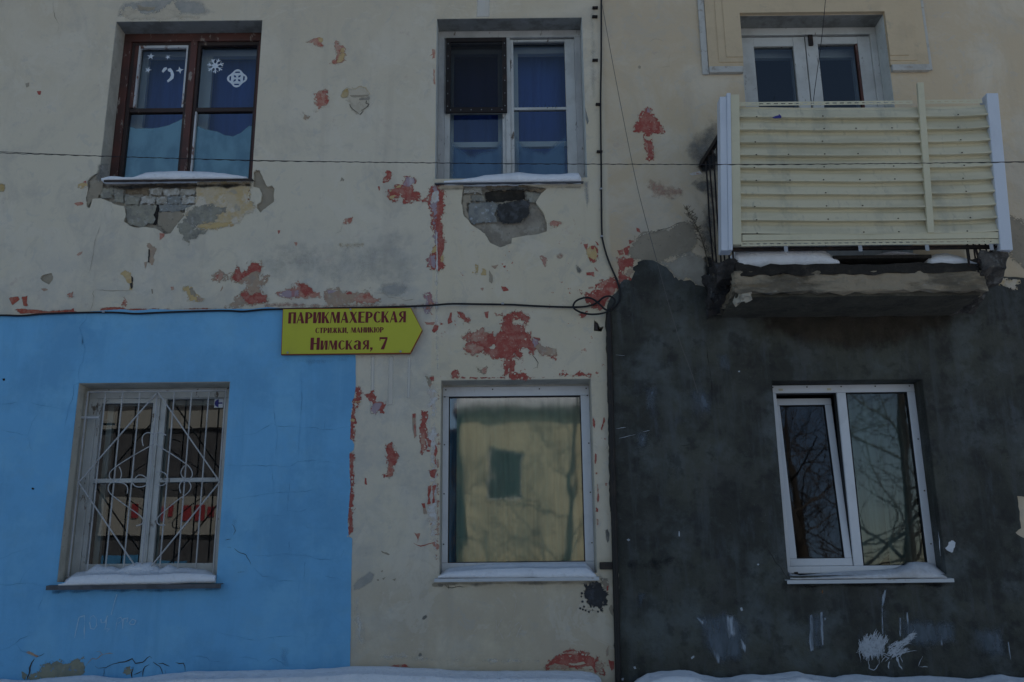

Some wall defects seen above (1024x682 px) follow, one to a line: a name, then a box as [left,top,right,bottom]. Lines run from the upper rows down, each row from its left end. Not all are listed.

peeling [633,106,665,162]
spalling [74,174,197,268]
spalling [254,171,274,212]
peeling [378,170,447,272]
spalling [462,185,563,247]
peeling [211,260,381,309]
spalling [730,281,753,307]
peeling [423,292,557,381]
peeling [347,386,387,537]
peeling [383,442,399,479]
peeling [21,651,85,680]
peeling [542,646,614,676]